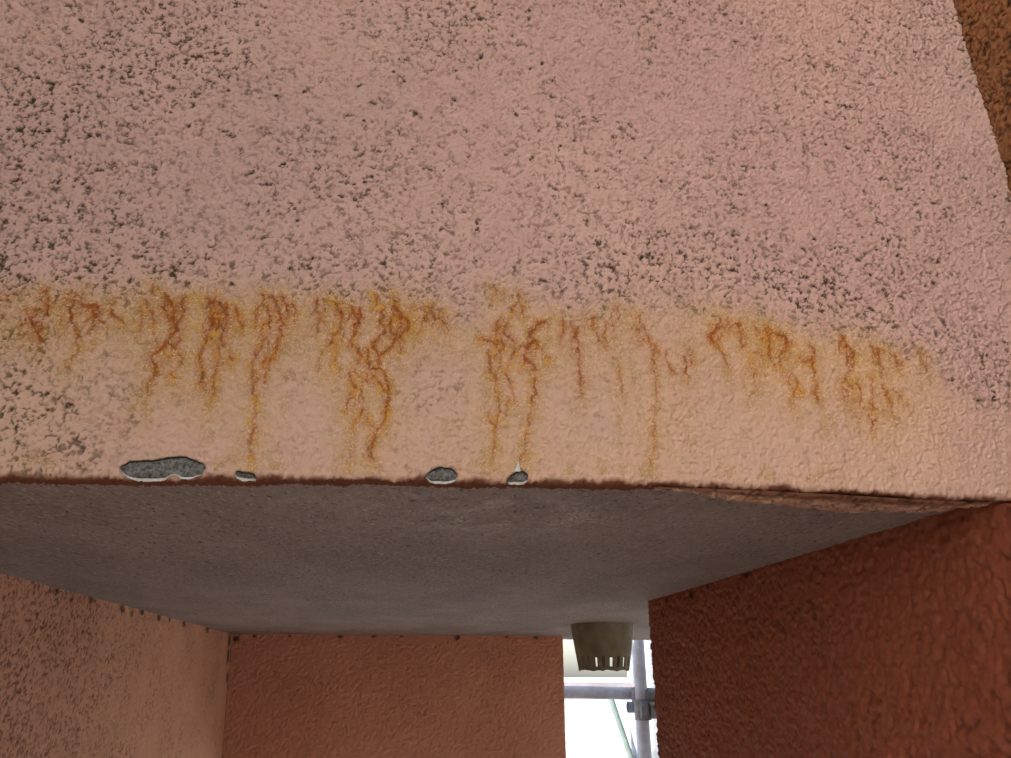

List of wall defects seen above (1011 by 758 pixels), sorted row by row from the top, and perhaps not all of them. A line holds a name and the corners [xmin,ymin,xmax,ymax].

corrosion [137,284,300,469]
corrosion [316,290,449,461]
corrosion [476,289,552,408]
corrosion [708,319,822,403]
peeling [120,456,206,482]
peeling [235,471,256,482]
peeling [425,467,458,484]
peeling [507,462,528,485]